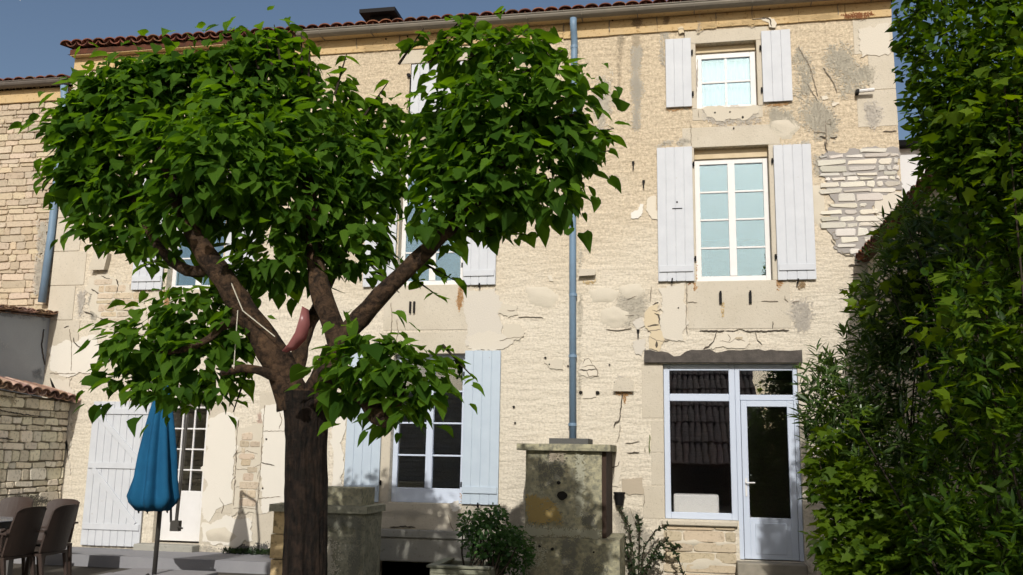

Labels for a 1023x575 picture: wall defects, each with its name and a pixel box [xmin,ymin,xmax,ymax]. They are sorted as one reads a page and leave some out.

water stain [702,40,878,145]
crack [798,47,837,99]
crack [814,119,837,153]
flaking render [817,146,905,256]
peeling [633,281,689,356]
crack [607,285,799,349]
crack [0,409,46,418]
peeling [200,404,285,548]